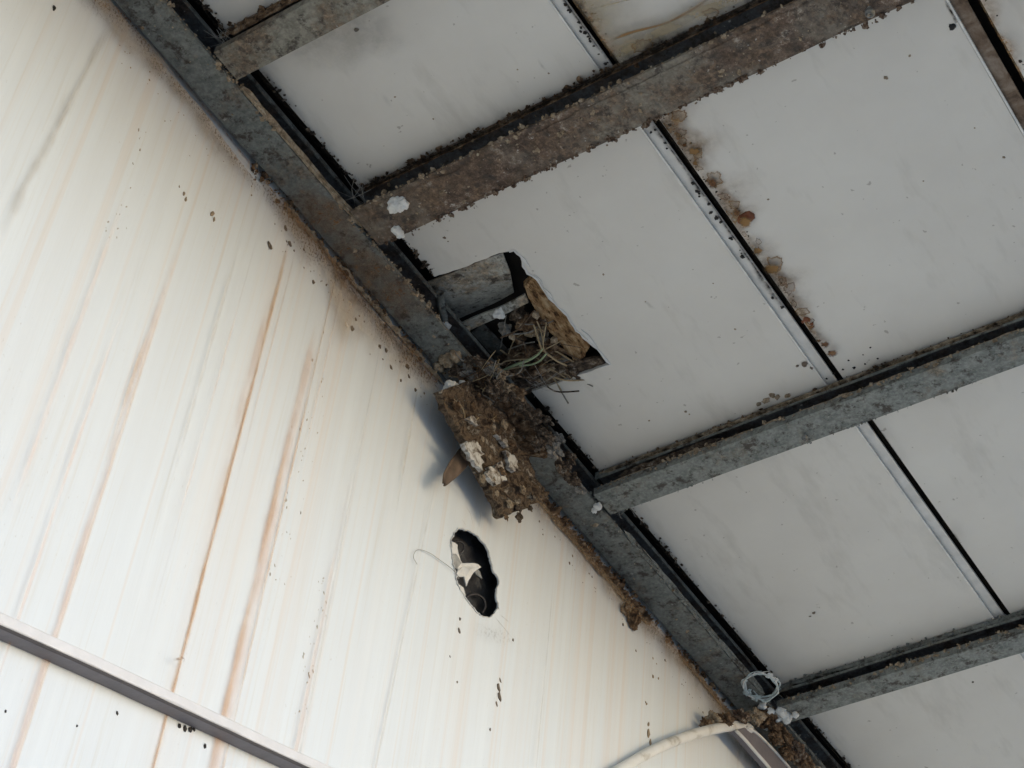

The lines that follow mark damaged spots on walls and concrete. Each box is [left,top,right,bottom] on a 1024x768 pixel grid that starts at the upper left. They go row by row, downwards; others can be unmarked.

hole [509,250,611,399]